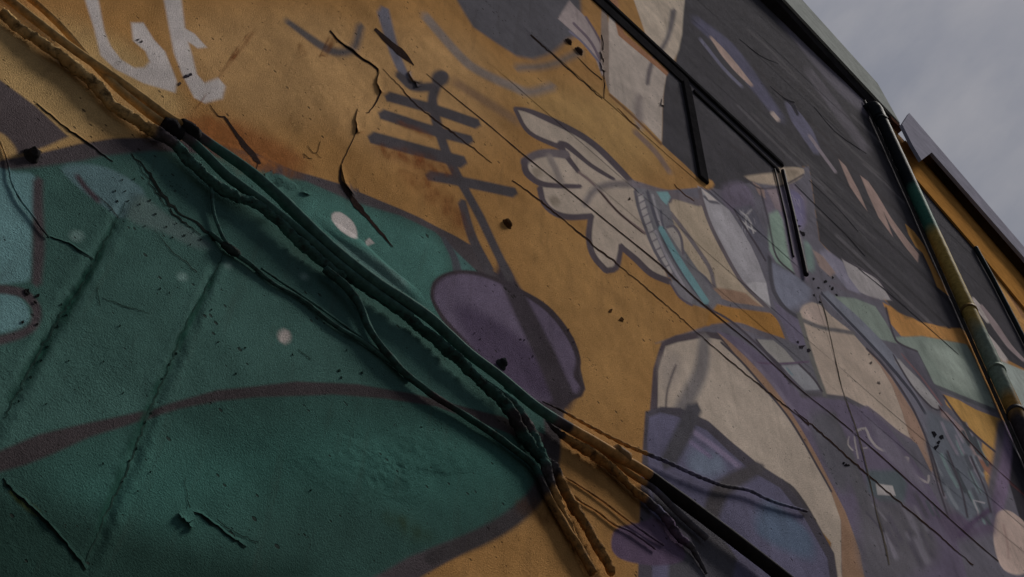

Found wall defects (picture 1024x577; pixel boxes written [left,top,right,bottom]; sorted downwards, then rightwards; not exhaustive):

peeling [409,66,426,87]
crack [3,102,225,570]
crack [303,28,999,566]
crack [938,405,1024,494]
crack [179,478,258,548]